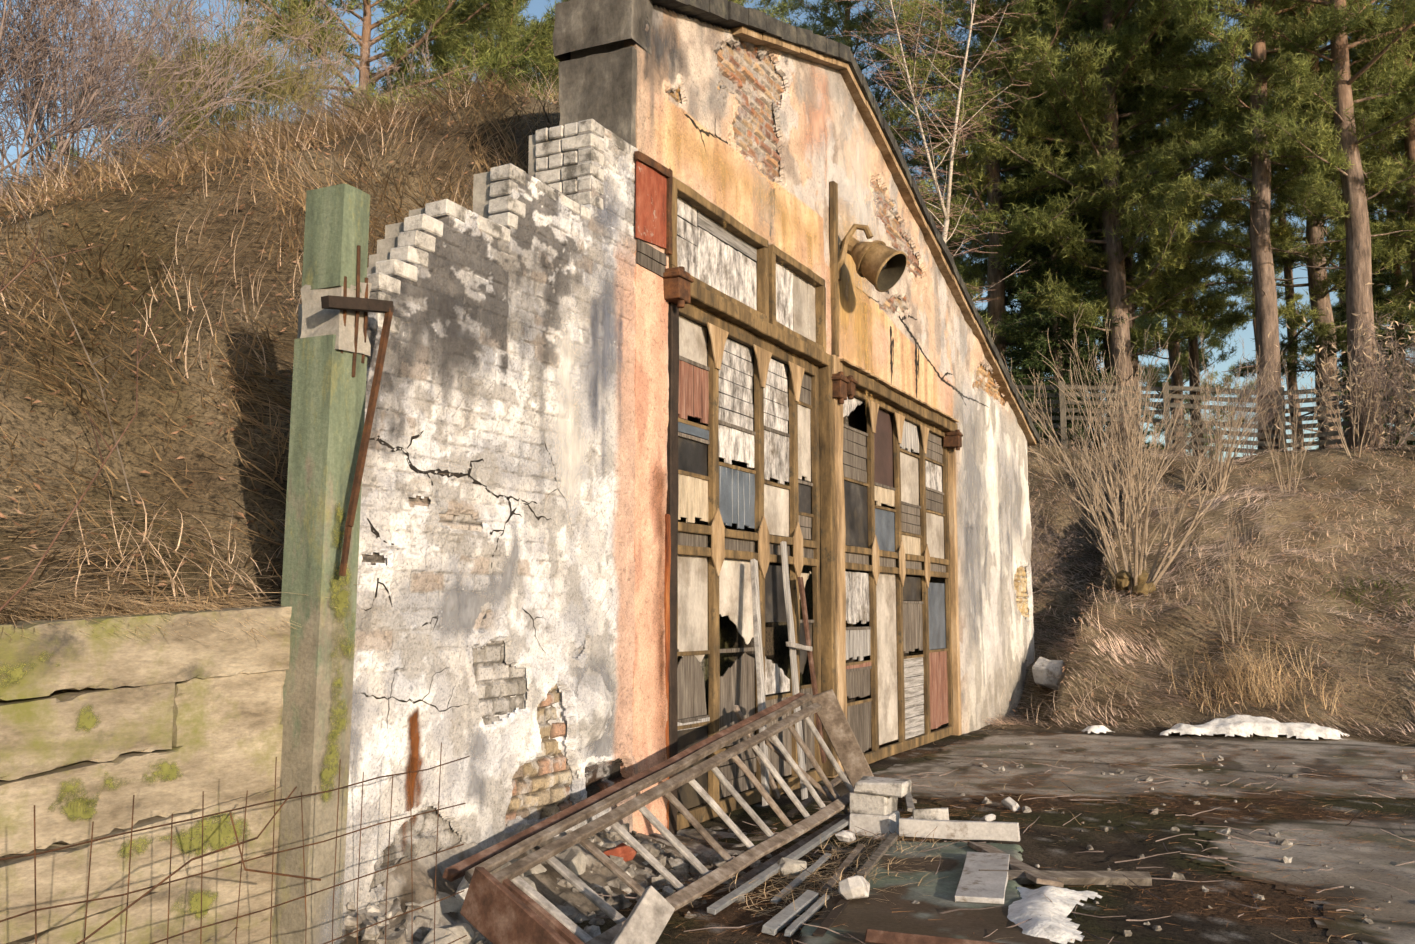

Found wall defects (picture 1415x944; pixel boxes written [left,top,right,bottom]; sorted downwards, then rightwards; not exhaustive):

spalling [712,34,794,191]
spalling [869,166,929,319]
crack [369,430,572,569]
spalling [1013,557,1033,628]
rust [404,709,423,827]
crack [361,662,467,729]
spalling [466,626,594,841]
spalling [354,790,475,906]